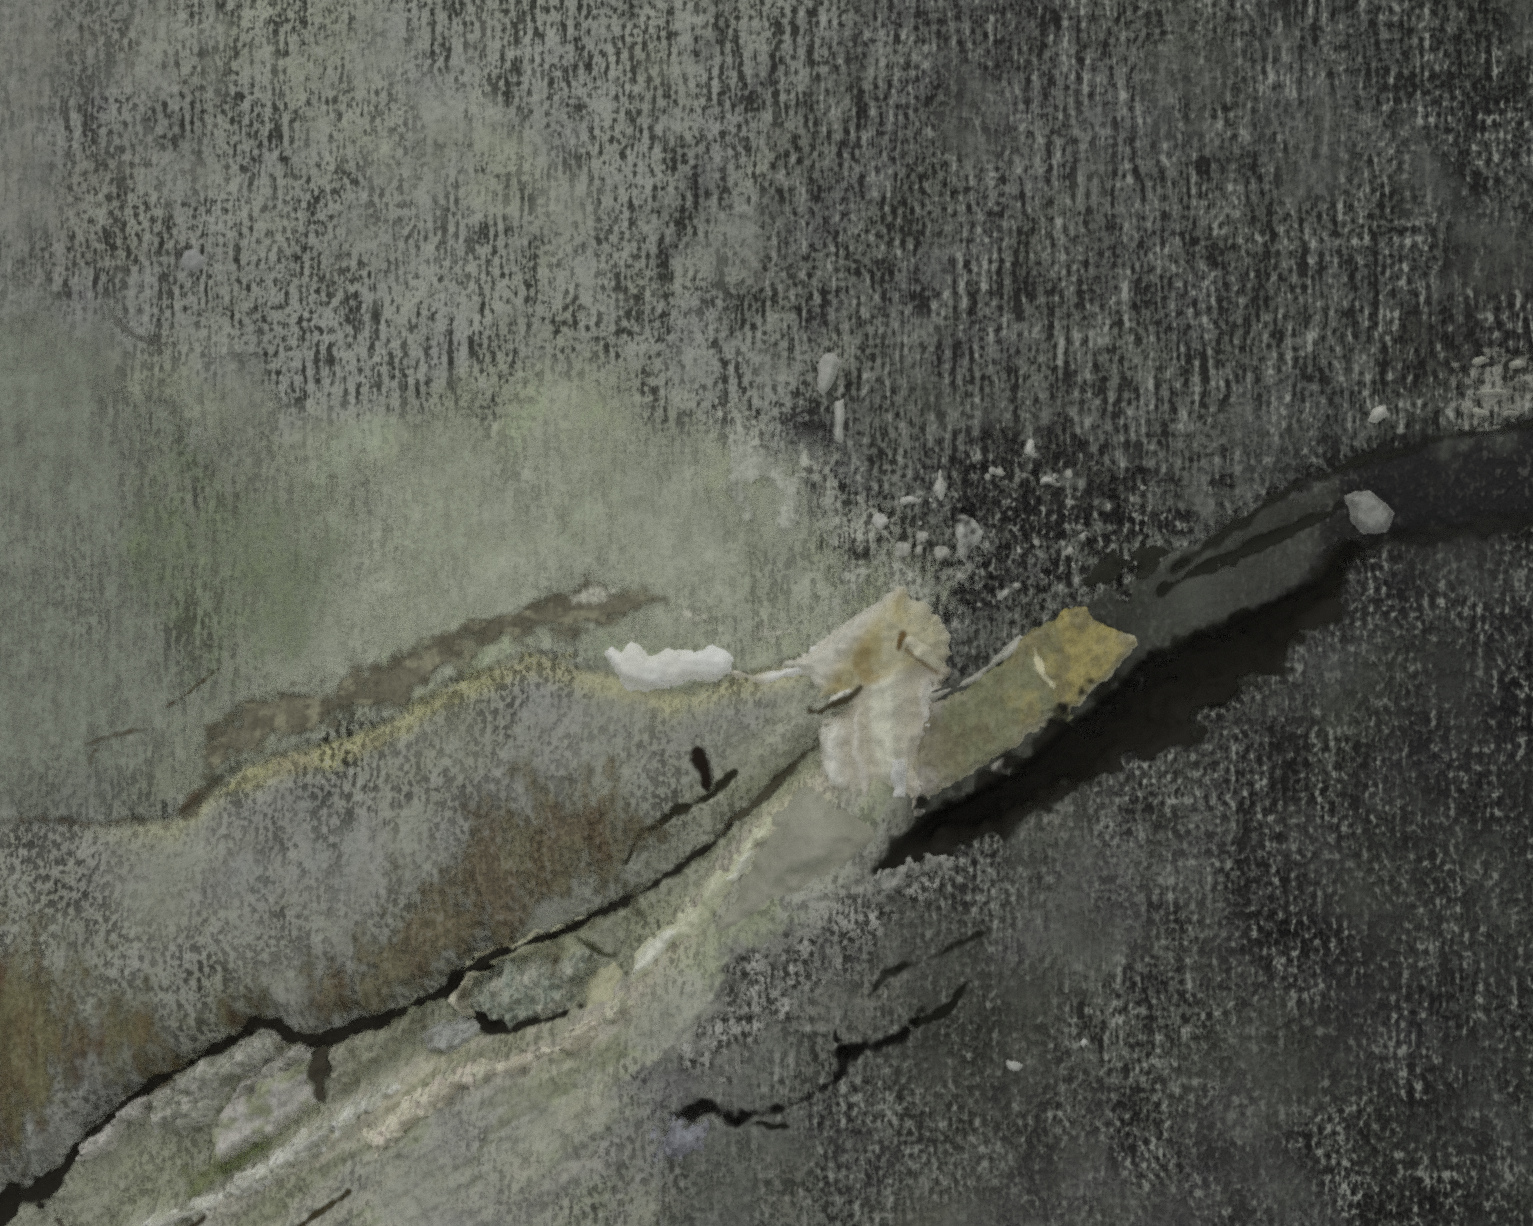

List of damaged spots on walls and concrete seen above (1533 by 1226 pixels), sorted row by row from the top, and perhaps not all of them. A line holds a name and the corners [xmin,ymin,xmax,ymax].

leakage [977,439,1073,493]
leakage [1106,485,1146,510]
peeling [1344,491,1395,535]
leakage [0,314,995,817]
leakage [996,582,1022,600]
leakage [1064,524,1092,567]
crack [167,669,218,706]
spalling [914,606,1138,799]
crack [90,729,133,762]
corrosion [301,758,669,1022]
spalling [679,853,955,1085]
spalling [76,1015,480,1226]